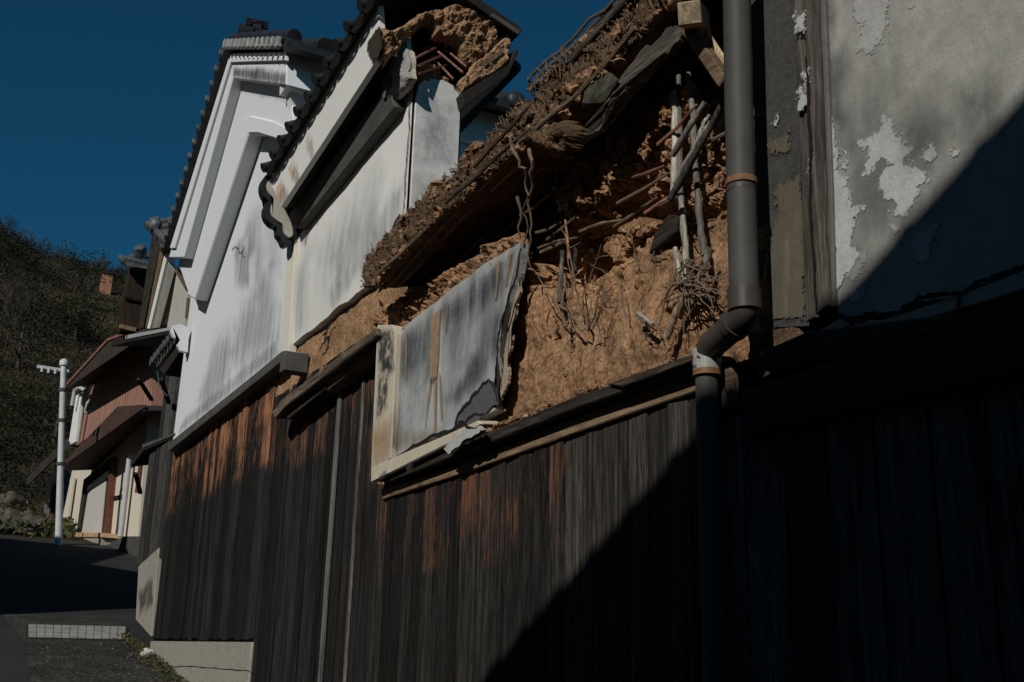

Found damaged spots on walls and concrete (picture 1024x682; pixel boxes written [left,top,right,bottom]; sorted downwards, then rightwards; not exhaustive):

flaking render [367,27,382,61]
flaking render [381,37,417,101]
flaking render [792,10,806,34]
flaking render [795,66,813,111]
flaking render [852,0,890,55]
flaking render [832,113,959,289]
flaking render [444,252,528,454]